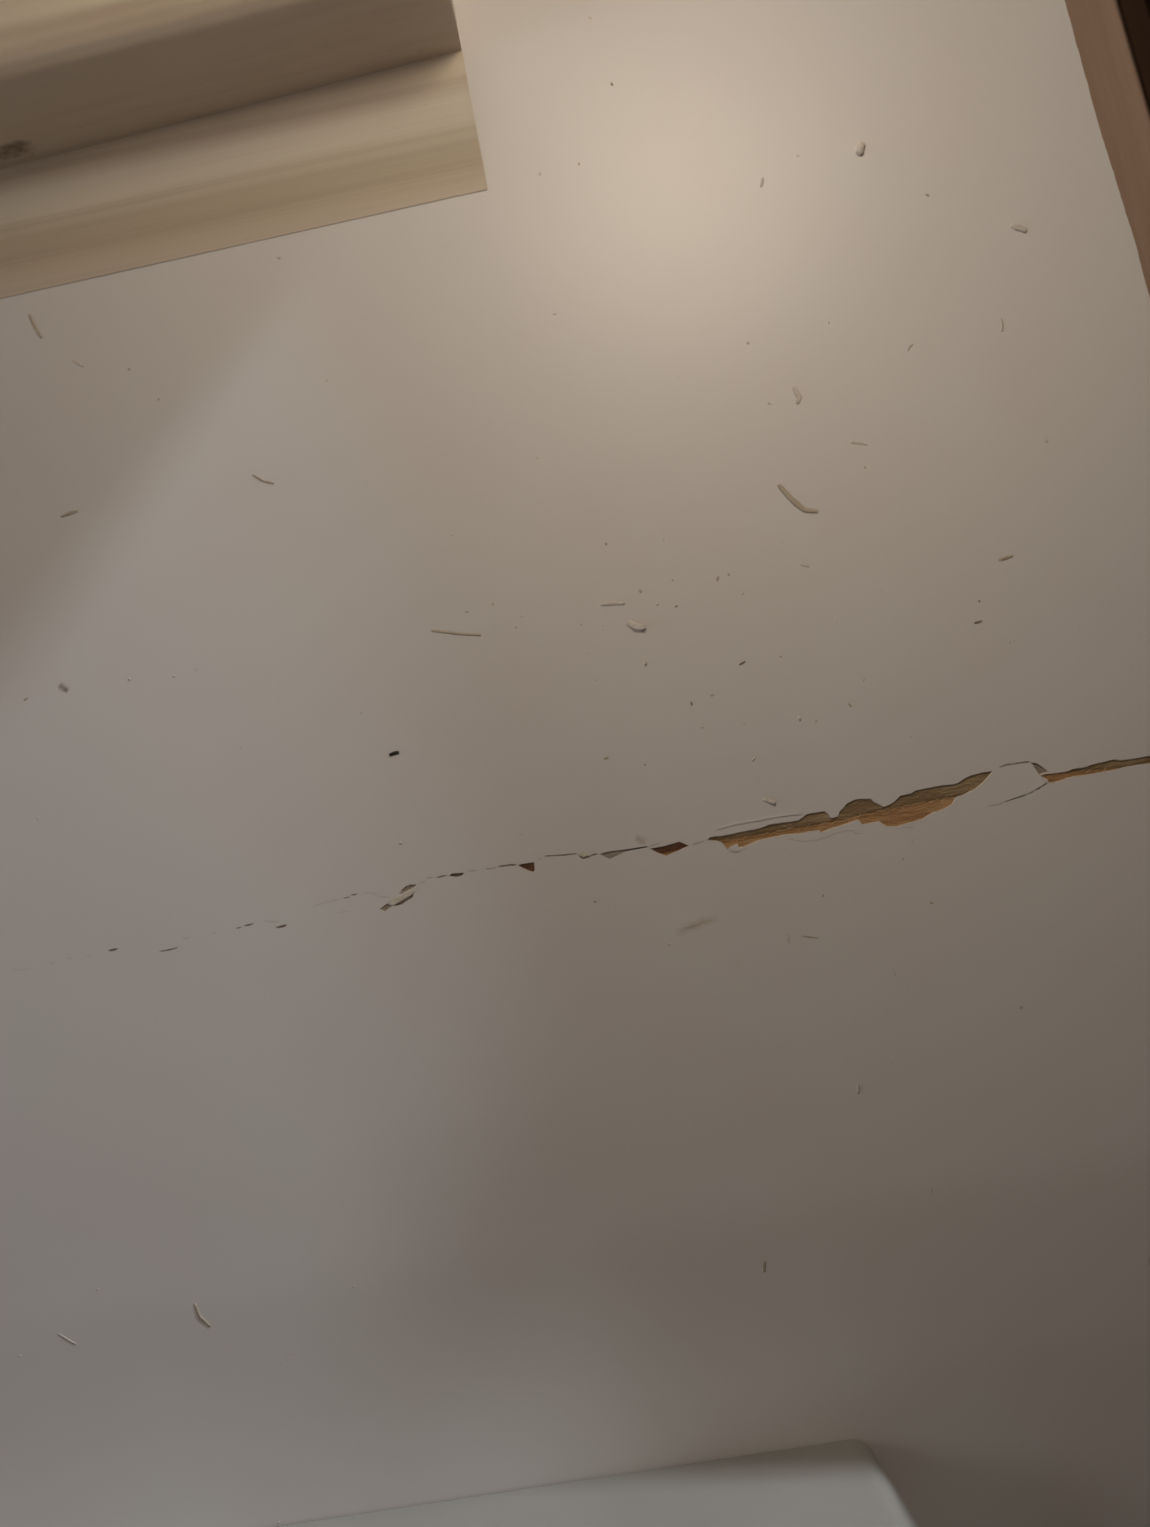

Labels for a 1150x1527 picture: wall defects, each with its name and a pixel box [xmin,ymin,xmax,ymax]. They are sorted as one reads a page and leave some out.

crack [162,841,739,951]
peeling [649,841,690,856]
peeling [707,756,1150,851]
crack [989,761,1047,806]